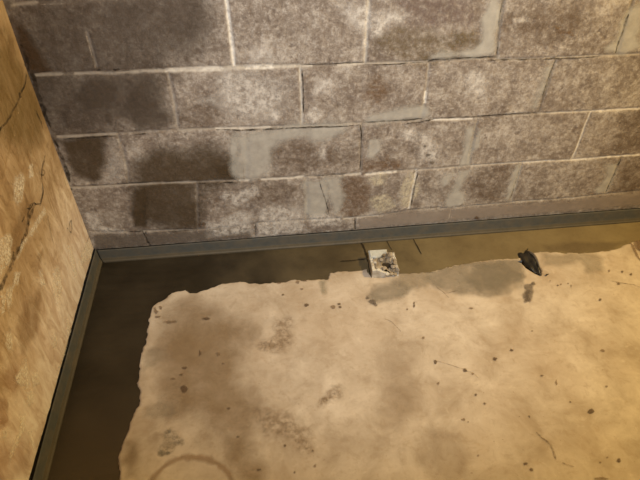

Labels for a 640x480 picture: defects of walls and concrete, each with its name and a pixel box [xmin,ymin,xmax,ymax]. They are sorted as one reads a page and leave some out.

water stain [65,138,117,180]
water stain [133,140,237,228]
crack [0,189,44,290]